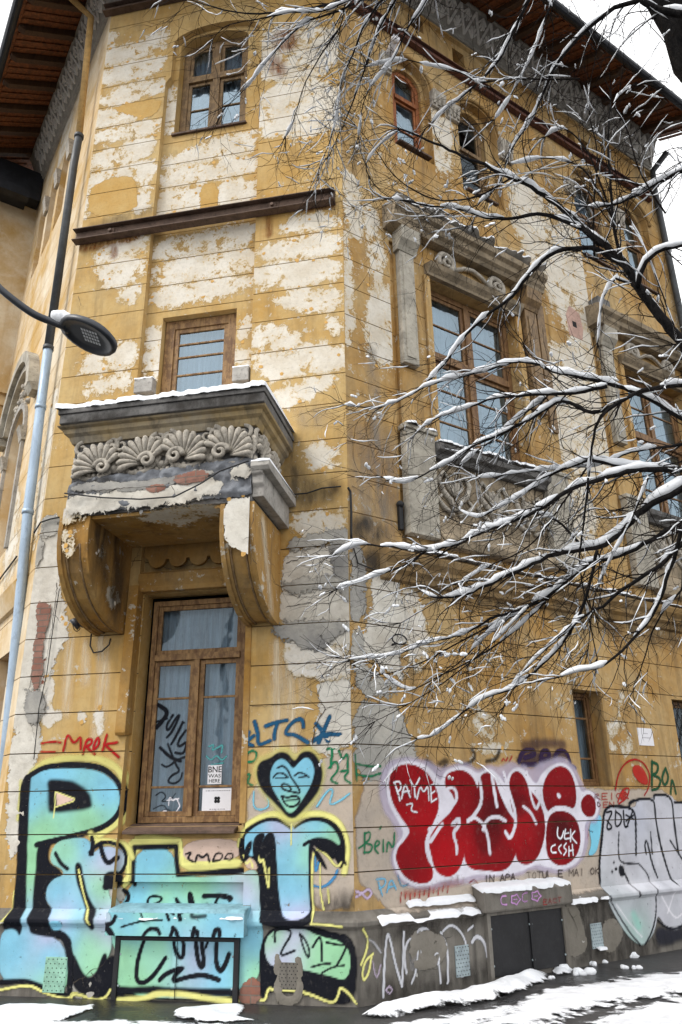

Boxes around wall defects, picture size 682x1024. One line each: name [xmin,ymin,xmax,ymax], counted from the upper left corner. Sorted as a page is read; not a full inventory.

peeling [83,19,340,221]
peeling [73,169,393,411]
spalling [2,379,253,860]
spalling [271,506,431,783]